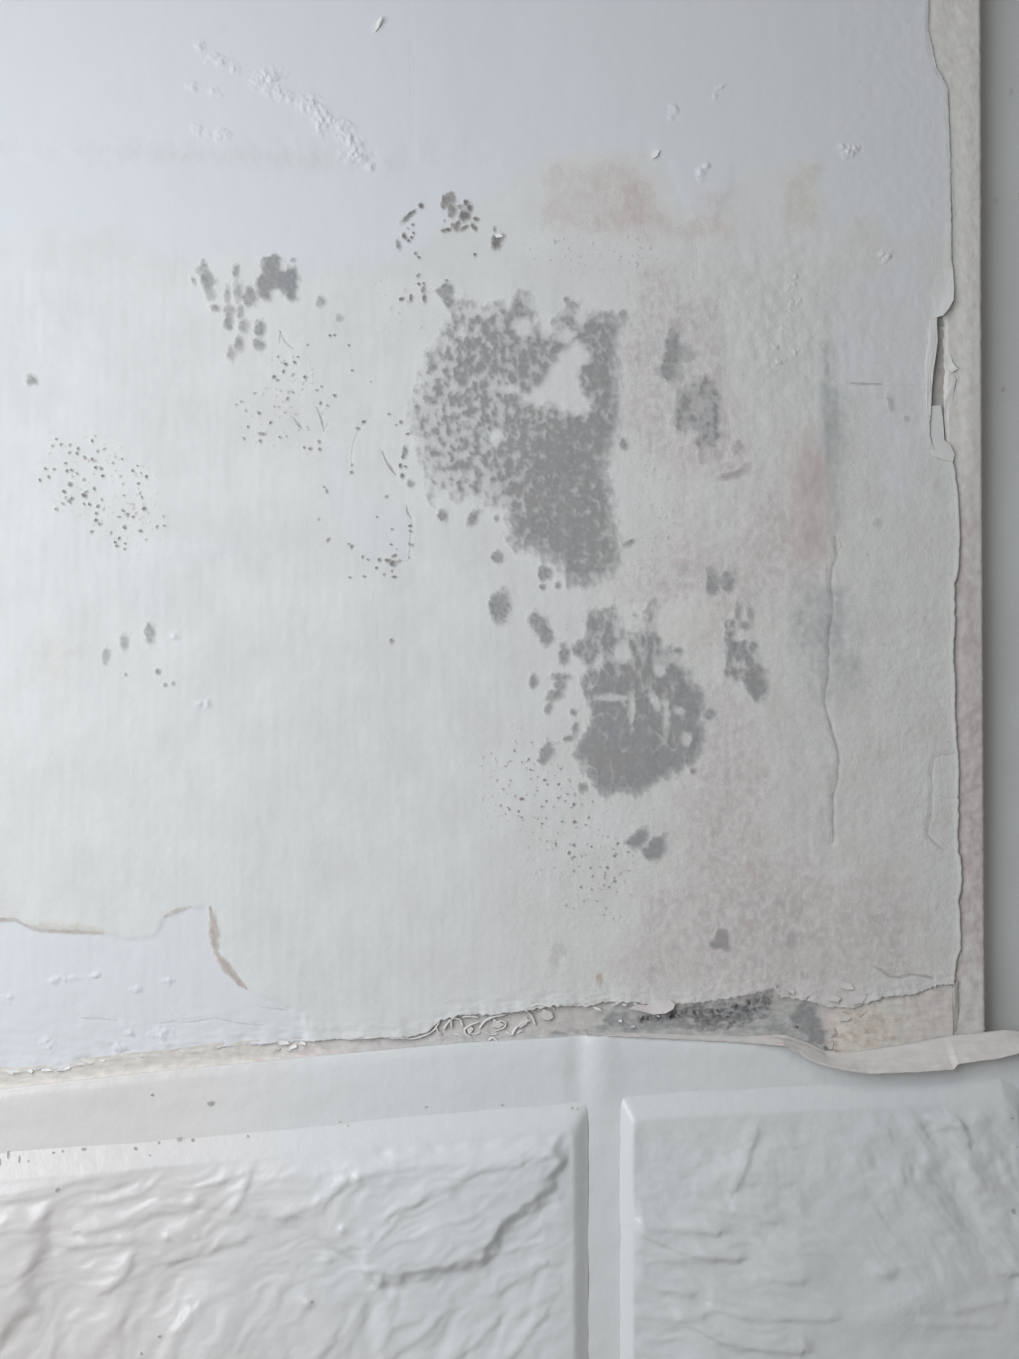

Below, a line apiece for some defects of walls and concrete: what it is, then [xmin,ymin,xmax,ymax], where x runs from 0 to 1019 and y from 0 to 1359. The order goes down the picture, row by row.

damp [440,191,479,232]
damp [38,435,165,550]
damp [191,254,336,451]
damp [347,524,413,578]
flaking render [0,267,1019,1089]
damp [387,203,749,590]
damp [482,582,753,919]
damp [683,566,767,703]
crack [823,536,841,842]
damp [649,852,902,1003]